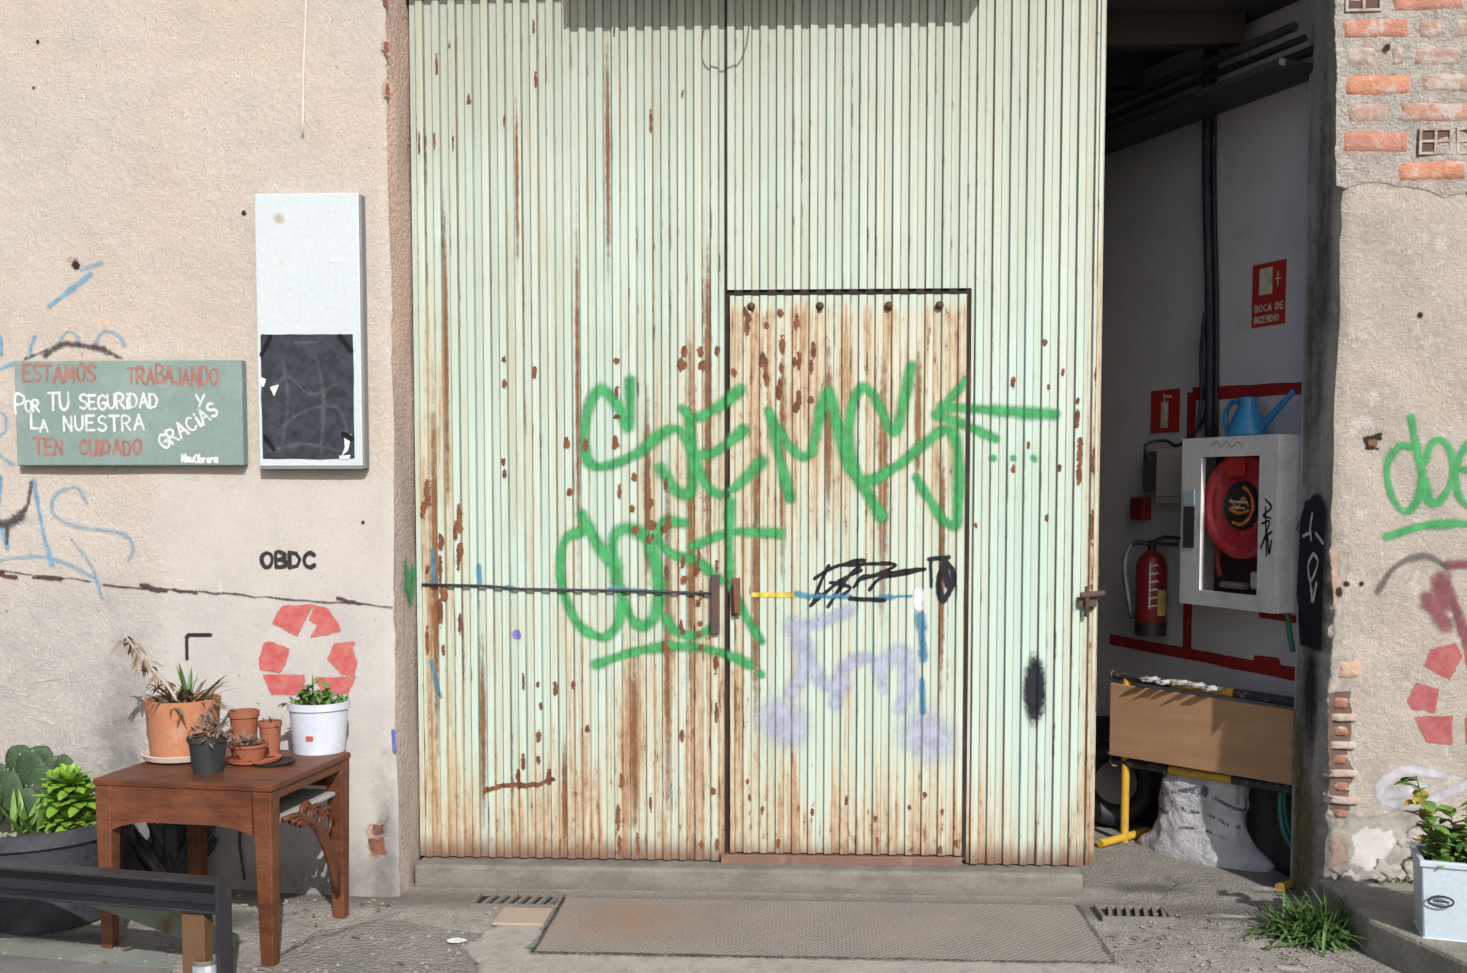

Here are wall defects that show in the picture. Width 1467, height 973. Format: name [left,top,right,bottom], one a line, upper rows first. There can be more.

flaking render [1334,0,1467,198]
crack [0,569,393,608]
rust [420,225,464,710]
rust [563,259,590,527]
rust [617,268,720,780]
rust [743,307,832,555]
rust [879,370,888,593]
rust [1057,368,1101,486]
rust [480,666,567,838]
rust [615,659,652,856]
leakage [1294,722,1313,897]
spalling [1323,550,1451,882]